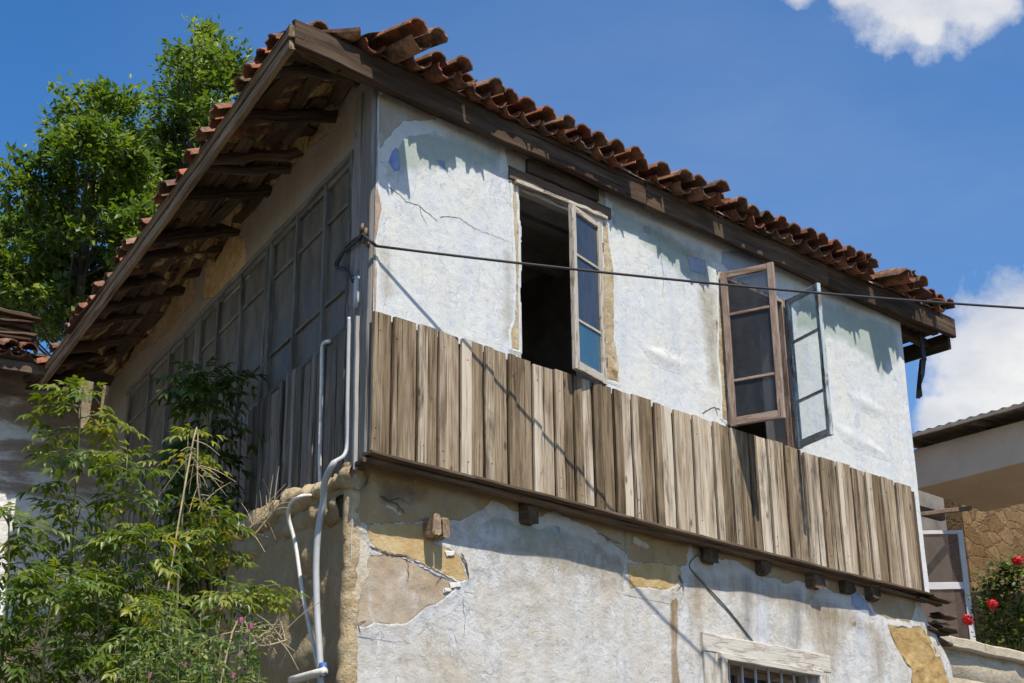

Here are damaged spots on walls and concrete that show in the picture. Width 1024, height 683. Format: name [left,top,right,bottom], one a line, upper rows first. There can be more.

crack [389,187,509,242]
spalling [580,189,621,387]
peeling [335,462,464,683]
crack [369,546,469,633]
spalling [915,602,943,659]